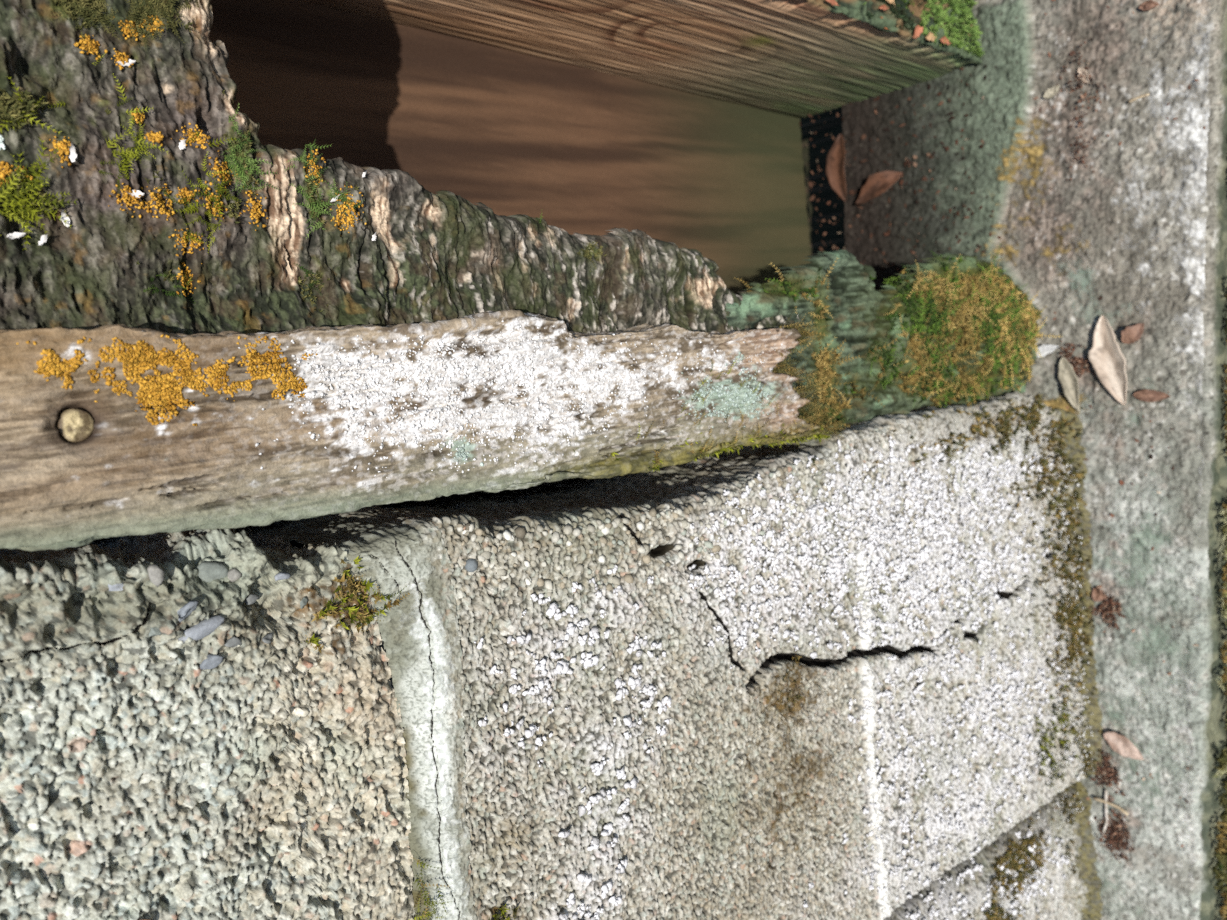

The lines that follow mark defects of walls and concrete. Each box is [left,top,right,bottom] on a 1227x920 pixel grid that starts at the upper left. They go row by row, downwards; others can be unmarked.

crack [620,514,642,545]
crack [994,553,1049,599]
crack [0,602,150,662]
crack [699,592,980,687]
crack [372,541,460,920]